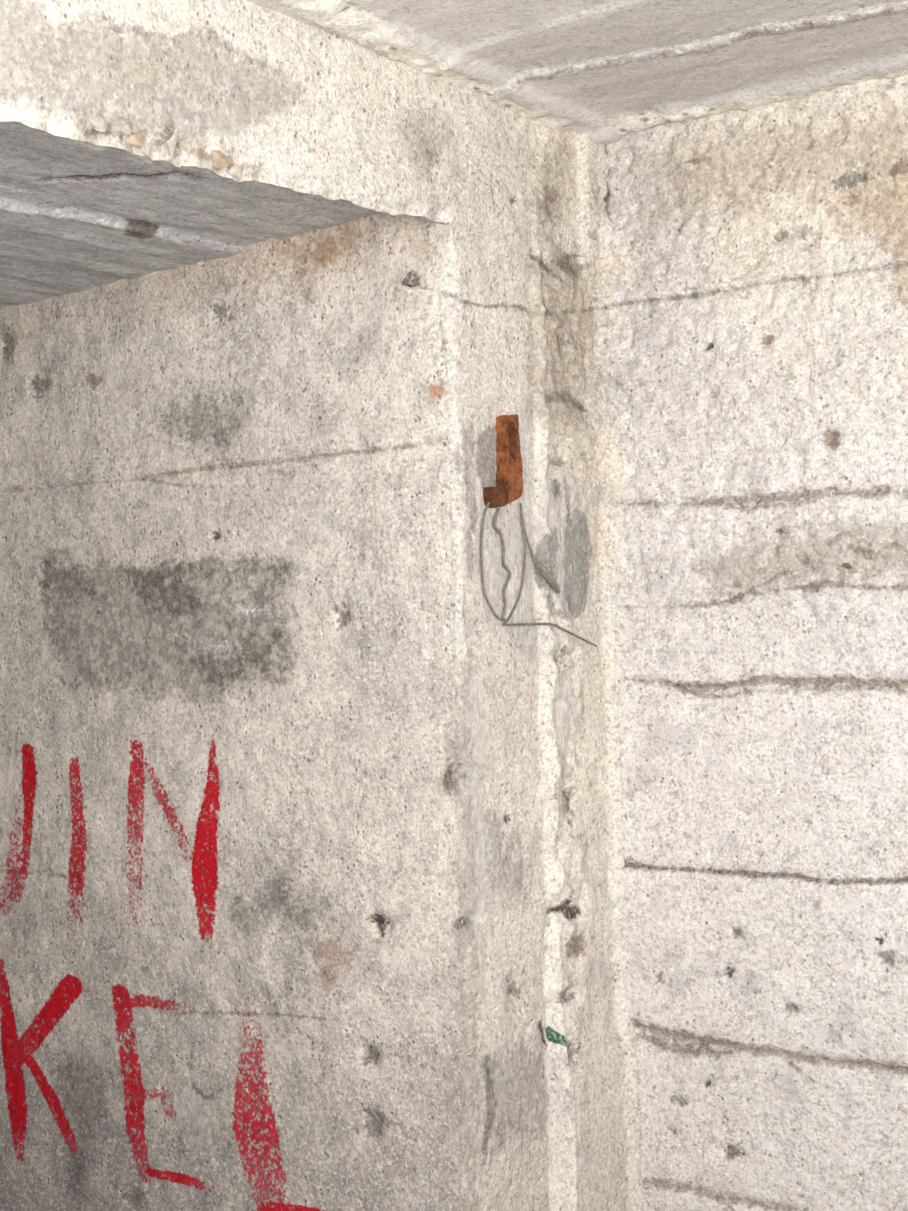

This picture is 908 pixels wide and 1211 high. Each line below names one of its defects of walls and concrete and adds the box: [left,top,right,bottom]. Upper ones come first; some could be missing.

rust [508,421,517,461]
crack [622,486,891,512]
water stain [476,408,592,651]
water stain [44,552,296,697]
crack [632,675,908,699]
crack [624,856,908,886]
crack [635,1019,908,1081]